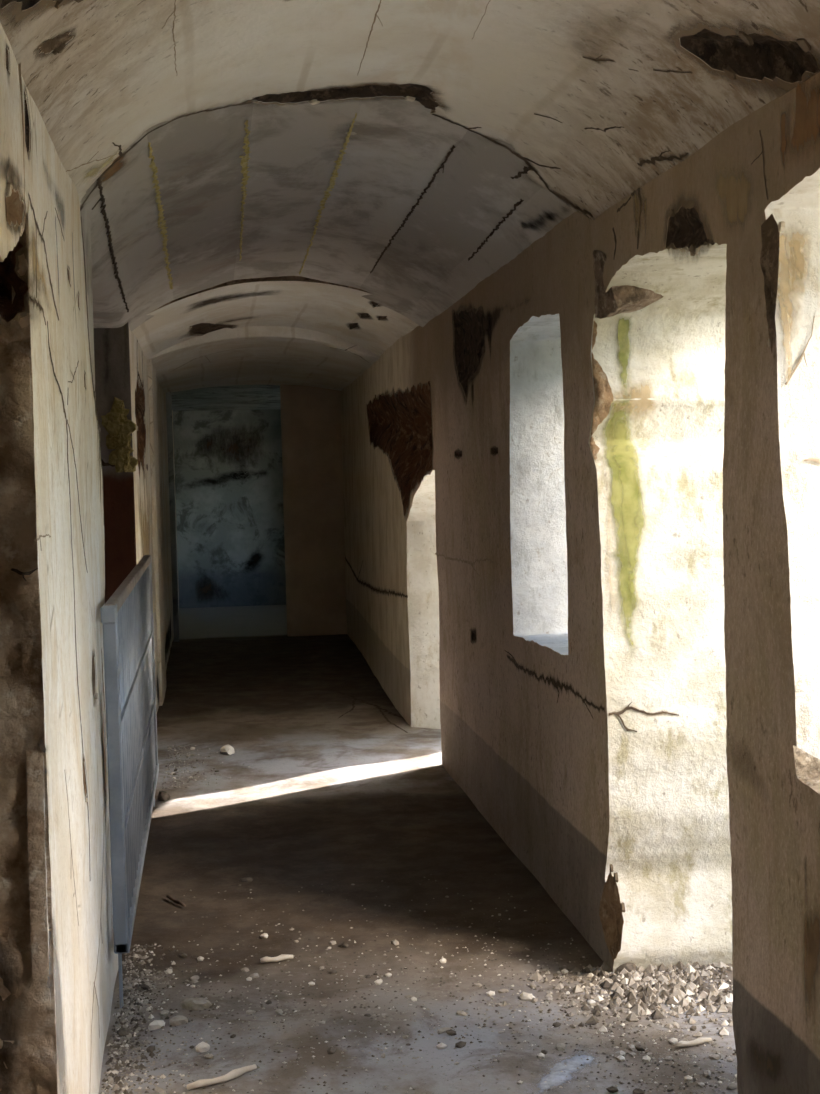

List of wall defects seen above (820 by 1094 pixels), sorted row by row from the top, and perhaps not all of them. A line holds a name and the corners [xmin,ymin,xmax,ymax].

spalling [0,0,83,25]
spalling [670,21,820,93]
crack [66,151,129,312]
crack [148,142,173,290]
crack [370,145,456,273]
leakage [617,318,631,387]
spalling [135,376,146,479]
leakage [613,421,639,595]
crack [11,194,104,1083]
crack [505,650,679,732]